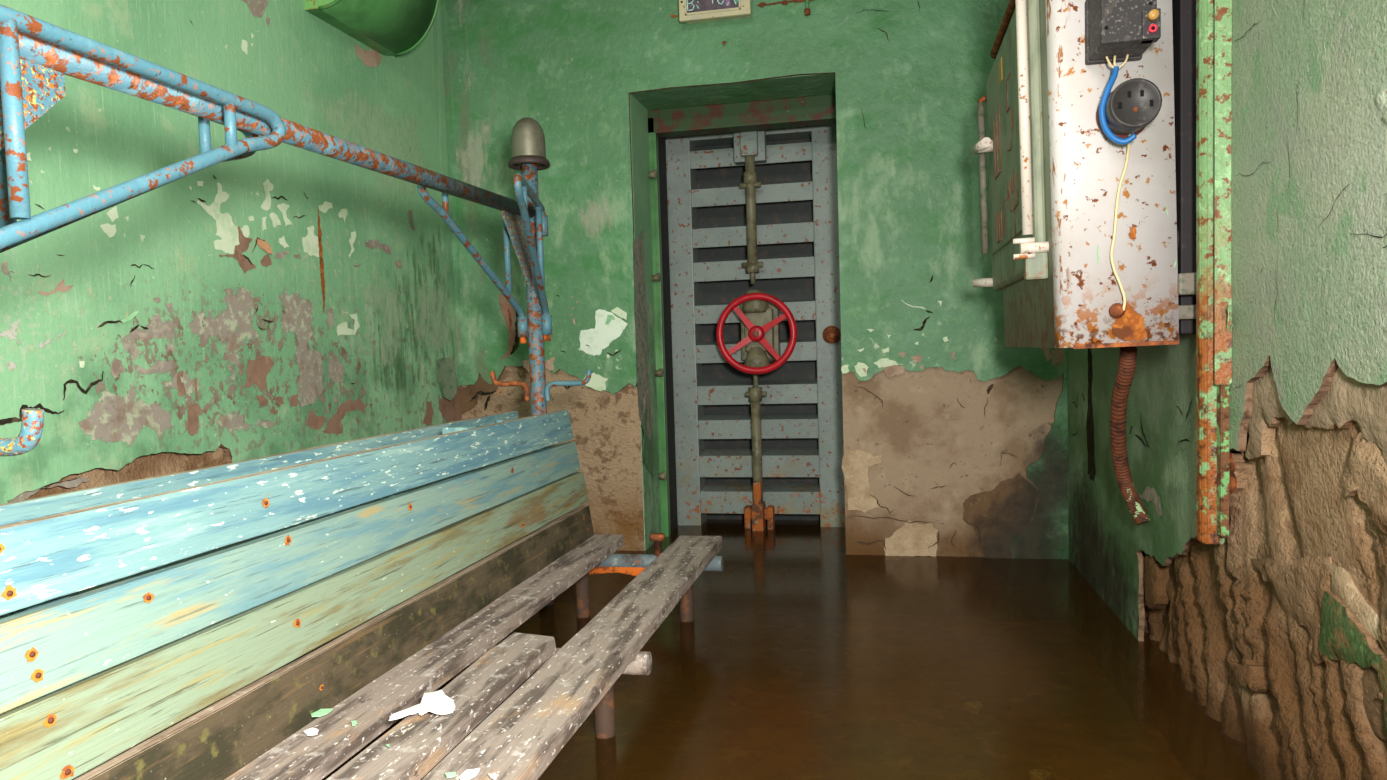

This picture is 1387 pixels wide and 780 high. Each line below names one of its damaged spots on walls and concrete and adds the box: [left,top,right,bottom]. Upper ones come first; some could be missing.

crack [0,371,104,425]
peeling [0,179,441,503]
flaking render [423,230,654,554]
flaking render [554,572,637,605]
flaking render [841,329,1064,617]
water stain [981,439,1130,643]
rust [1229,452,1253,522]
flaking render [1138,367,1387,780]